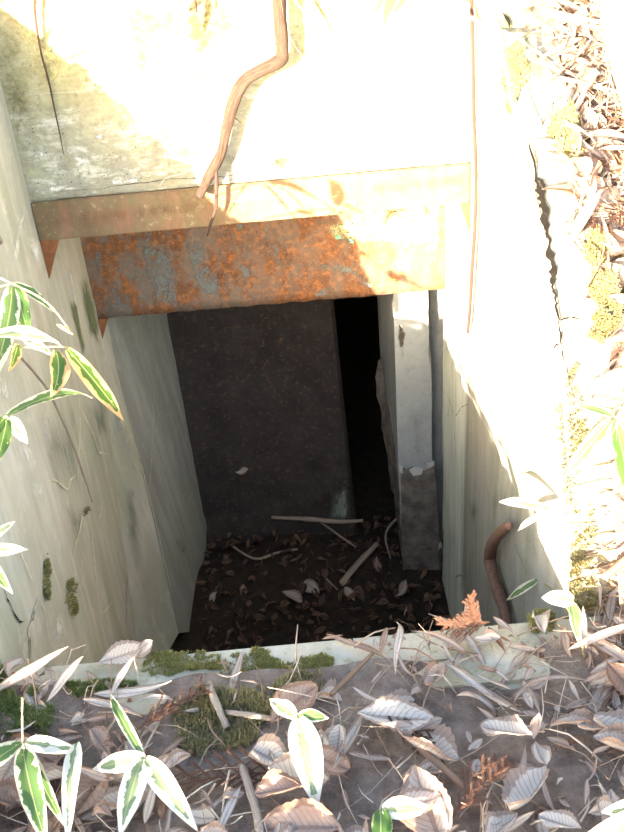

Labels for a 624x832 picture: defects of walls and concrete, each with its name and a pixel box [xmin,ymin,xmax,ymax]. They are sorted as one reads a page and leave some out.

crack [528,131,581,376]